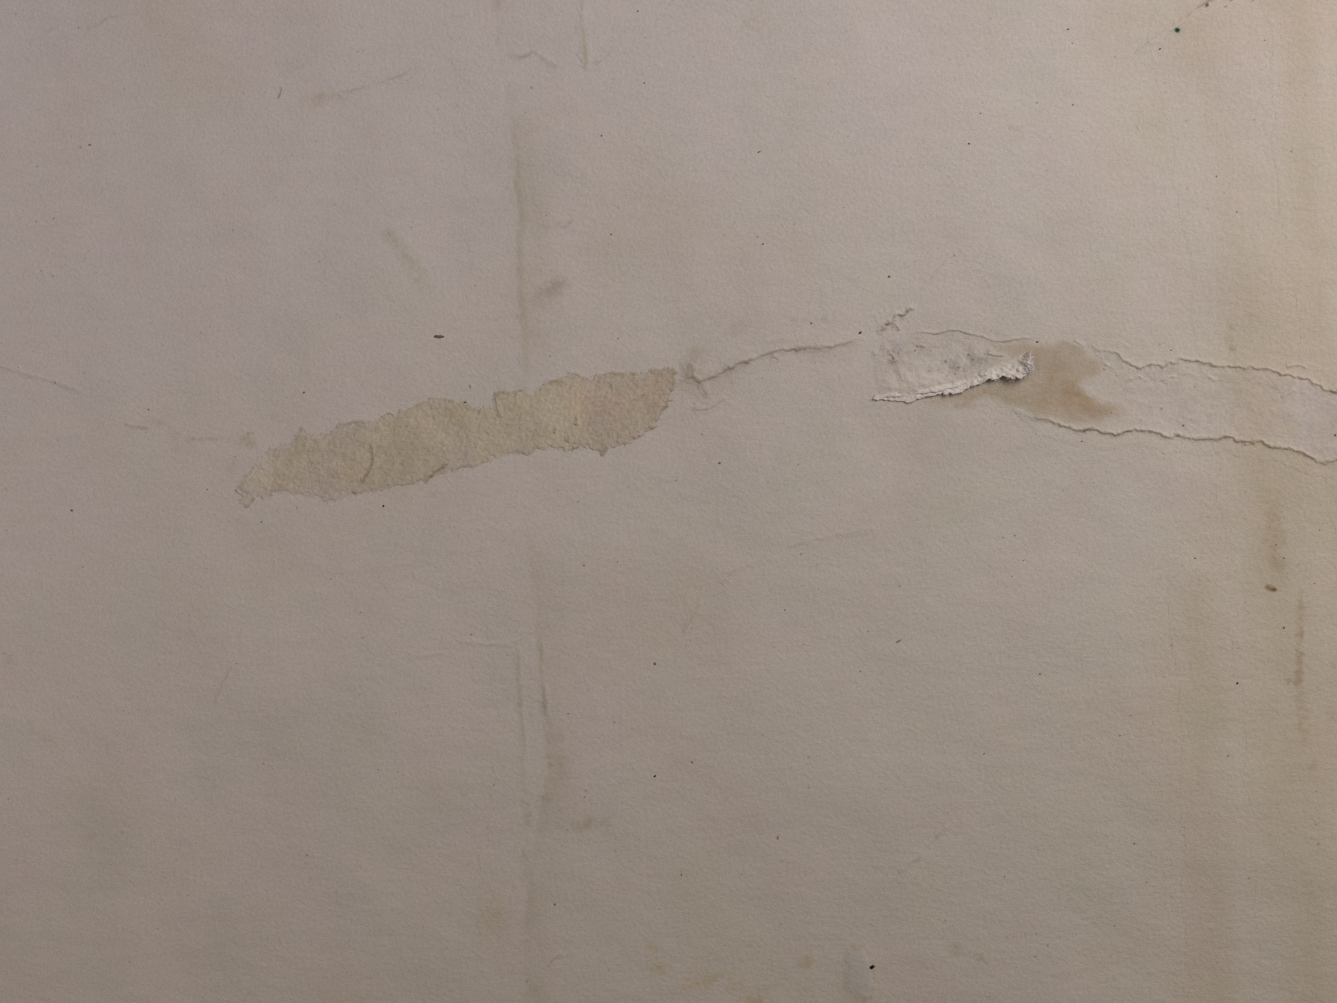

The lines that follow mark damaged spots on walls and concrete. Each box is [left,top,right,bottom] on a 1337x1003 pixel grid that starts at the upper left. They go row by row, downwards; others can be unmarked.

peeling [234,363,679,509]
water stain [917,335,1133,418]